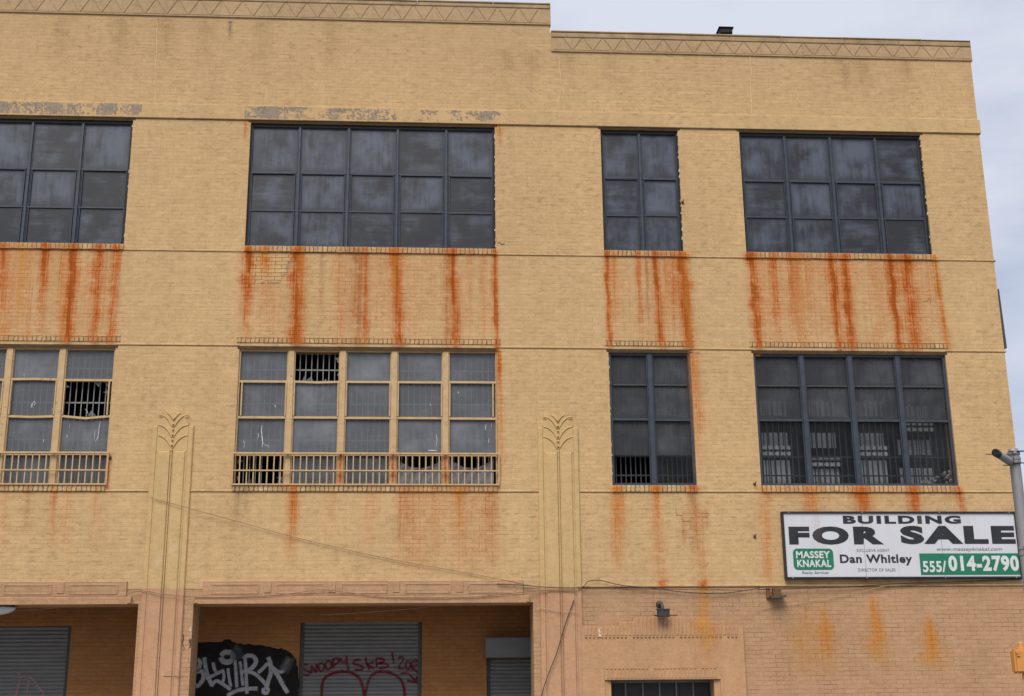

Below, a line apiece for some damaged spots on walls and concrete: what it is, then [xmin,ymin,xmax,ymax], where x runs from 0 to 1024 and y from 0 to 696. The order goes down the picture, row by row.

peeling [0,101,142,128]
peeling [245,106,501,122]
rust [64,243,77,341]
rust [241,245,269,318]
rust [288,246,304,344]
rust [391,247,404,344]
rust [446,248,460,344]
rust [492,249,502,420]
rust [637,250,700,417]
rust [745,252,804,356]
rust [817,253,855,349]
rust [884,254,921,350]